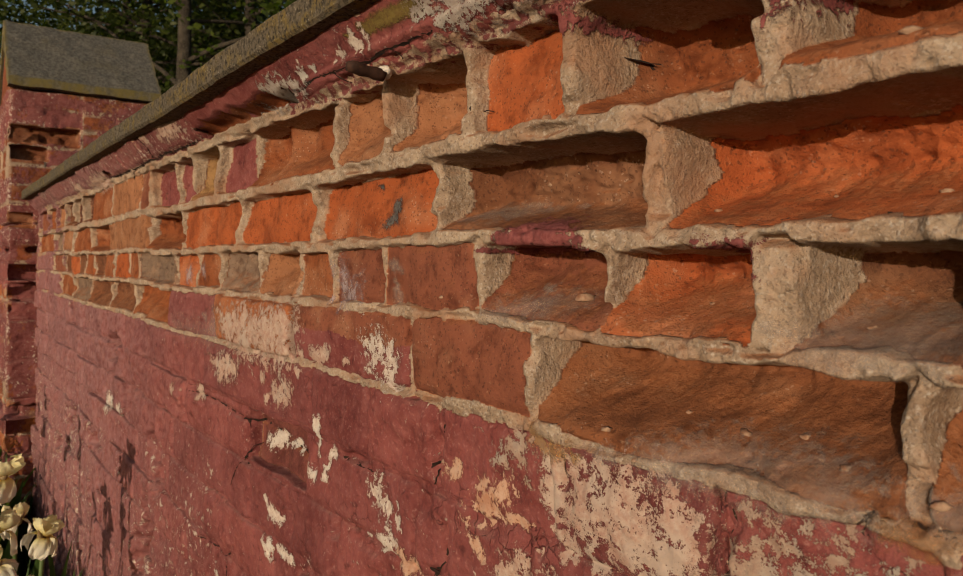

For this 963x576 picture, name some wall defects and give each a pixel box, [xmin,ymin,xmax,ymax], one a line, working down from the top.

spalling [8,124,80,162]
spalling [137,63,320,152]
spalling [227,94,391,193]
peeling [333,22,371,66]
crack [293,30,433,94]
spalling [393,83,468,151]
spalling [324,150,648,240]
spalling [401,0,768,132]
spalling [663,105,963,229]
spalling [794,250,963,367]
spalling [6,170,932,576]
spalling [931,410,963,534]